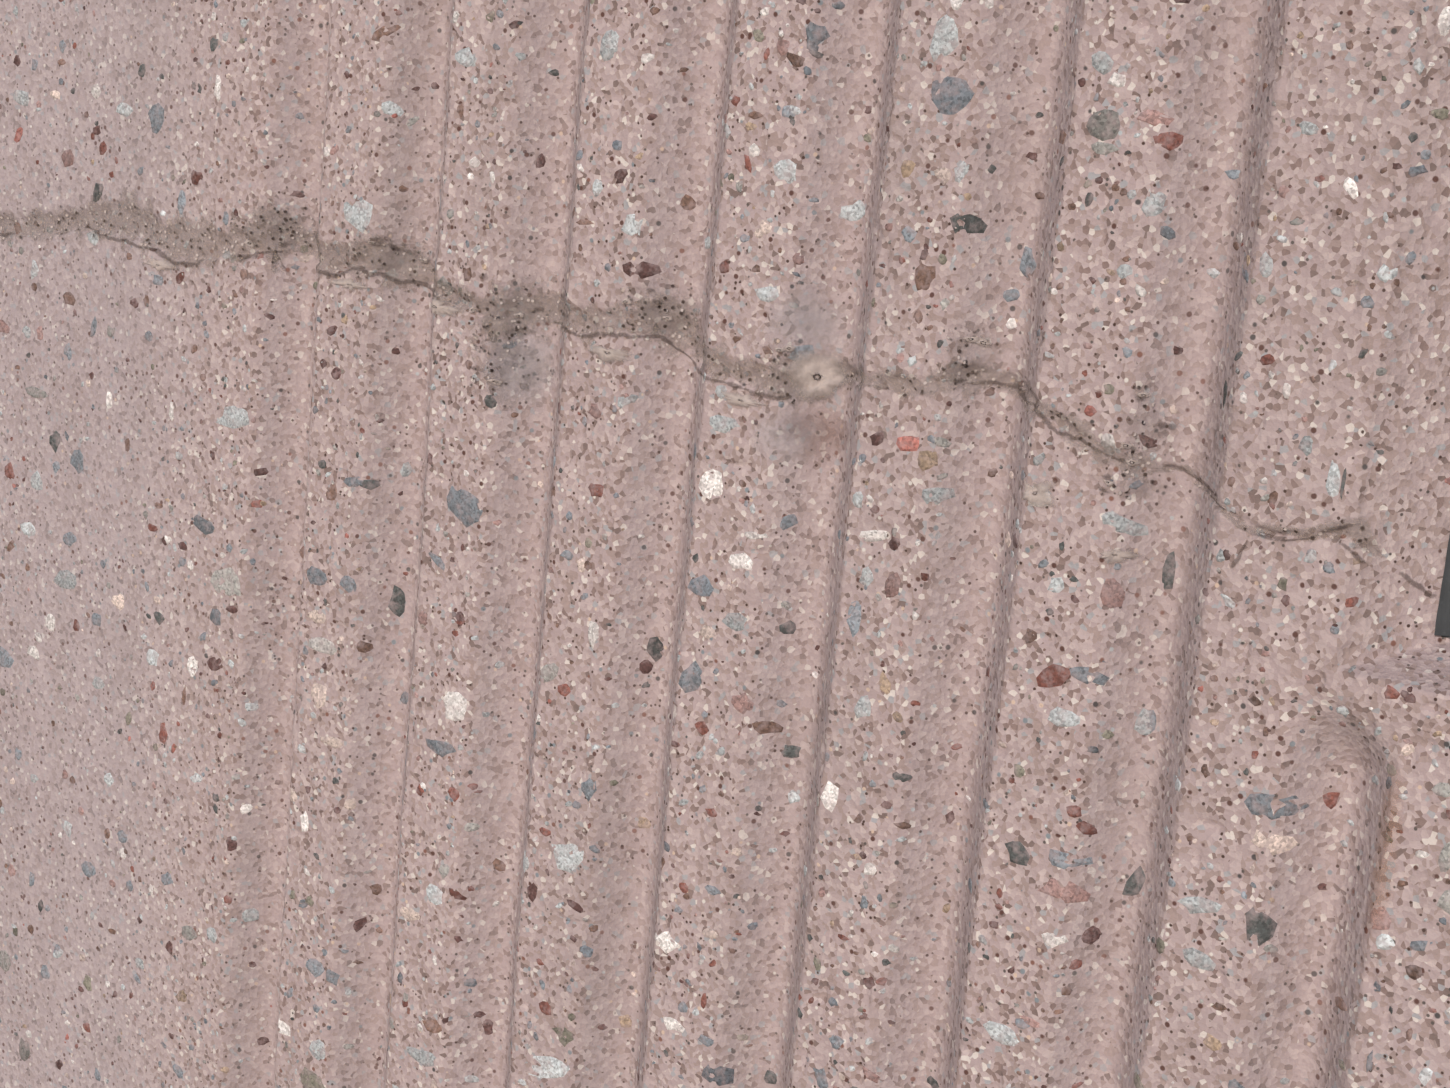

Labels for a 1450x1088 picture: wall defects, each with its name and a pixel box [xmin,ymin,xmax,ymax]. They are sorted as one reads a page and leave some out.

crack [0,193,1370,553]